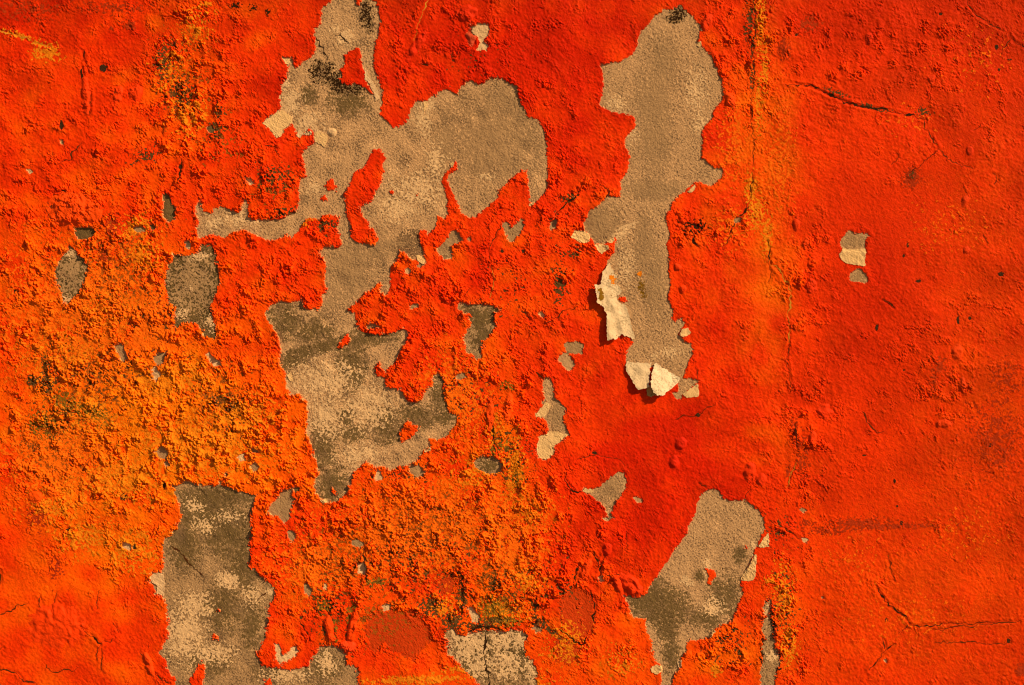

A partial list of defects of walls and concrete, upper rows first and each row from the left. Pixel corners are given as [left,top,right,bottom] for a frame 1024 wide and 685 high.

crack [784,83,970,172]
peeling [55,227,95,304]
peeling [164,0,548,503]
peeling [571,5,724,399]
peeling [839,231,869,283]
peeling [535,378,569,460]
peeling [150,473,360,685]
peeling [362,604,543,685]
peeling [623,488,770,685]
crack [869,556,1019,670]